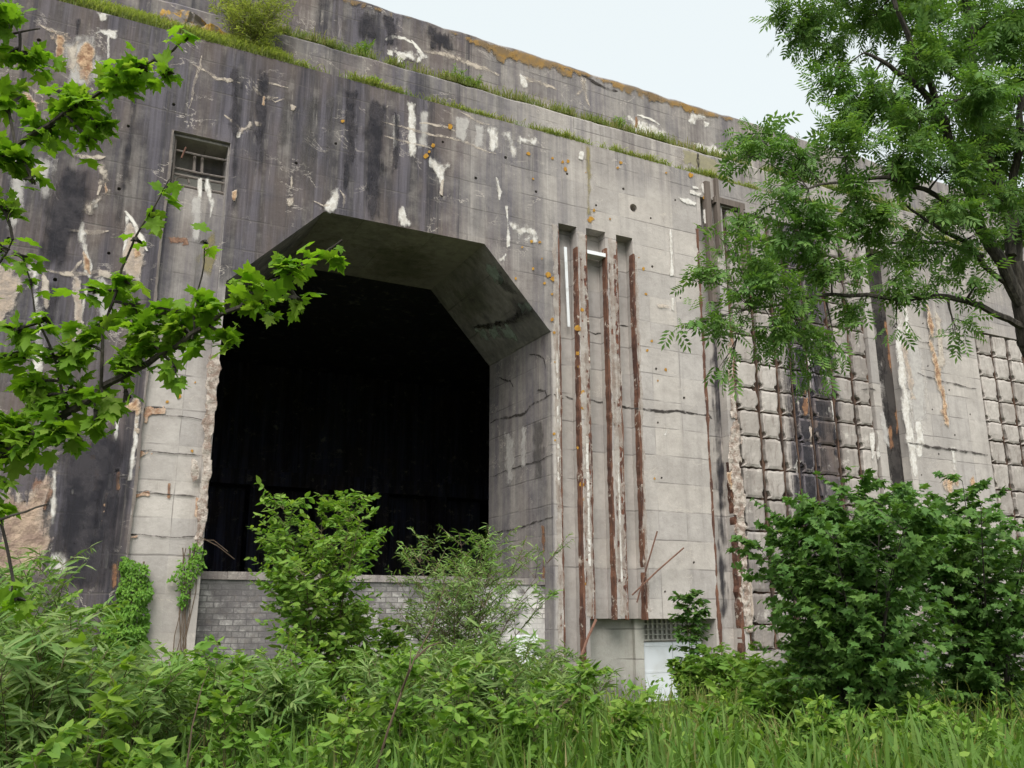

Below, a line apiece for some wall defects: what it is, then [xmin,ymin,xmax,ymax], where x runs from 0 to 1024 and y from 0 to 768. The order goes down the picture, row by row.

spalling [41,25,98,85]
damp [344,90,428,216]
spalling [0,471,56,578]
damp [49,421,123,588]
spalling [191,355,222,551]
crack [474,302,545,364]
crack [491,377,712,423]
spalling [727,339,754,633]
rust [926,305,949,428]